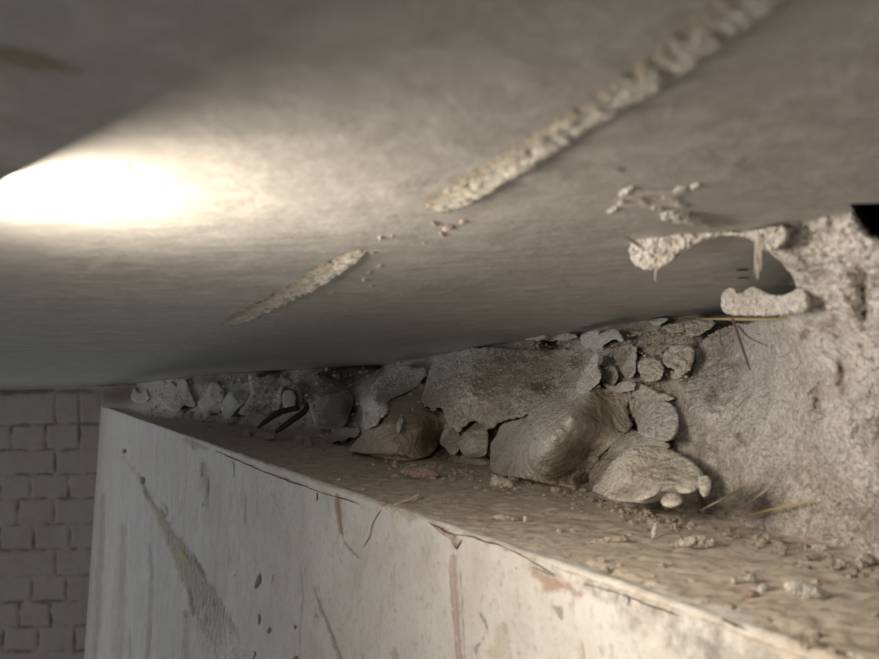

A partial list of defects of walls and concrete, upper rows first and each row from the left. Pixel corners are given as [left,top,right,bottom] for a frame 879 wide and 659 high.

peeling [433,524,462,547]
corrosion [449,554,465,659]